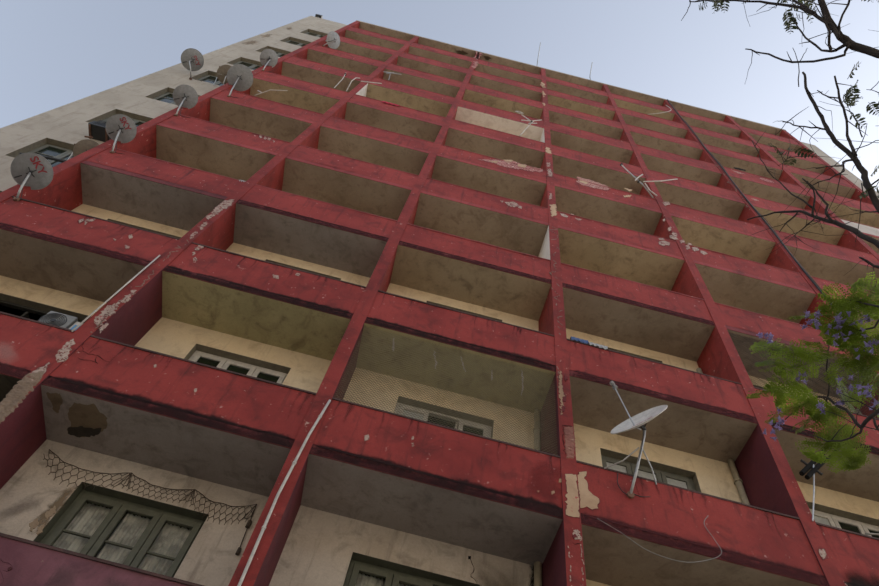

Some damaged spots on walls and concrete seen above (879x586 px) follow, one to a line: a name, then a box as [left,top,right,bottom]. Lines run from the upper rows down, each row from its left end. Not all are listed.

peeling [478,147,553,177]
peeling [576,177,611,191]
peeling [90,199,235,333]
flaking render [0,339,75,424]
peeling [46,392,108,438]
damp [309,445,563,518]
peeling [551,471,600,519]
peeling [568,530,585,586]